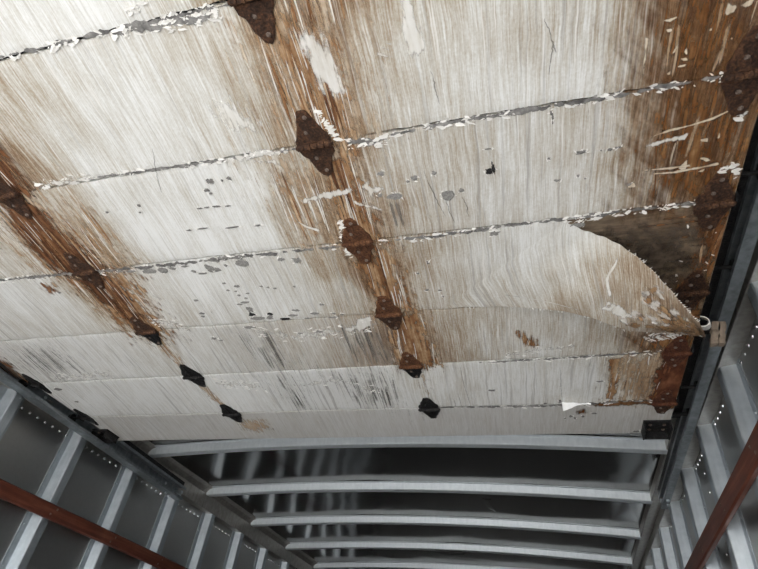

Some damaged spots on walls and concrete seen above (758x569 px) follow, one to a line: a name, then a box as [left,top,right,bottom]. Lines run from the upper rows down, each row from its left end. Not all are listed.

peeling [0,0,230,61]
peeling [300,31,345,96]
peeling [314,71,724,150]
corrosion [627,0,758,215]
peeling [34,147,296,190]
corrosion [240,0,444,392]
peeling [717,162,743,179]
corrosion [0,145,190,366]
corrosion [689,210,730,286]
peeling [222,282,372,342]
corrosion [516,330,538,347]
corrosion [576,286,705,414]